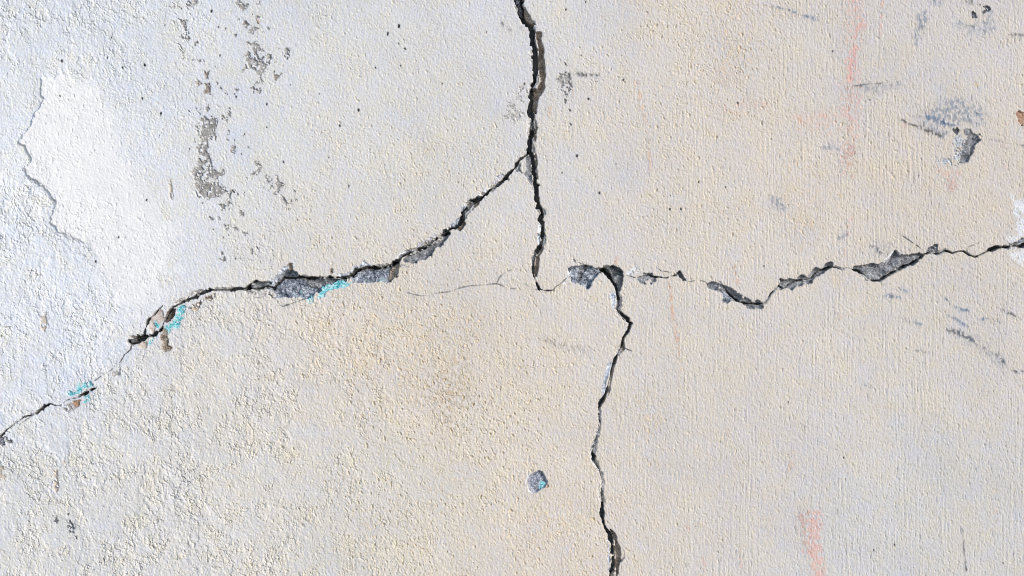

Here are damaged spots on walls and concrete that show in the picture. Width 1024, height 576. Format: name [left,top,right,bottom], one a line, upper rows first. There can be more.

crack [0,0,568,440]
spalling [167,0,451,304]
spalling [935,127,982,168]
spalling [524,469,550,494]
crack [588,232,1024,576]